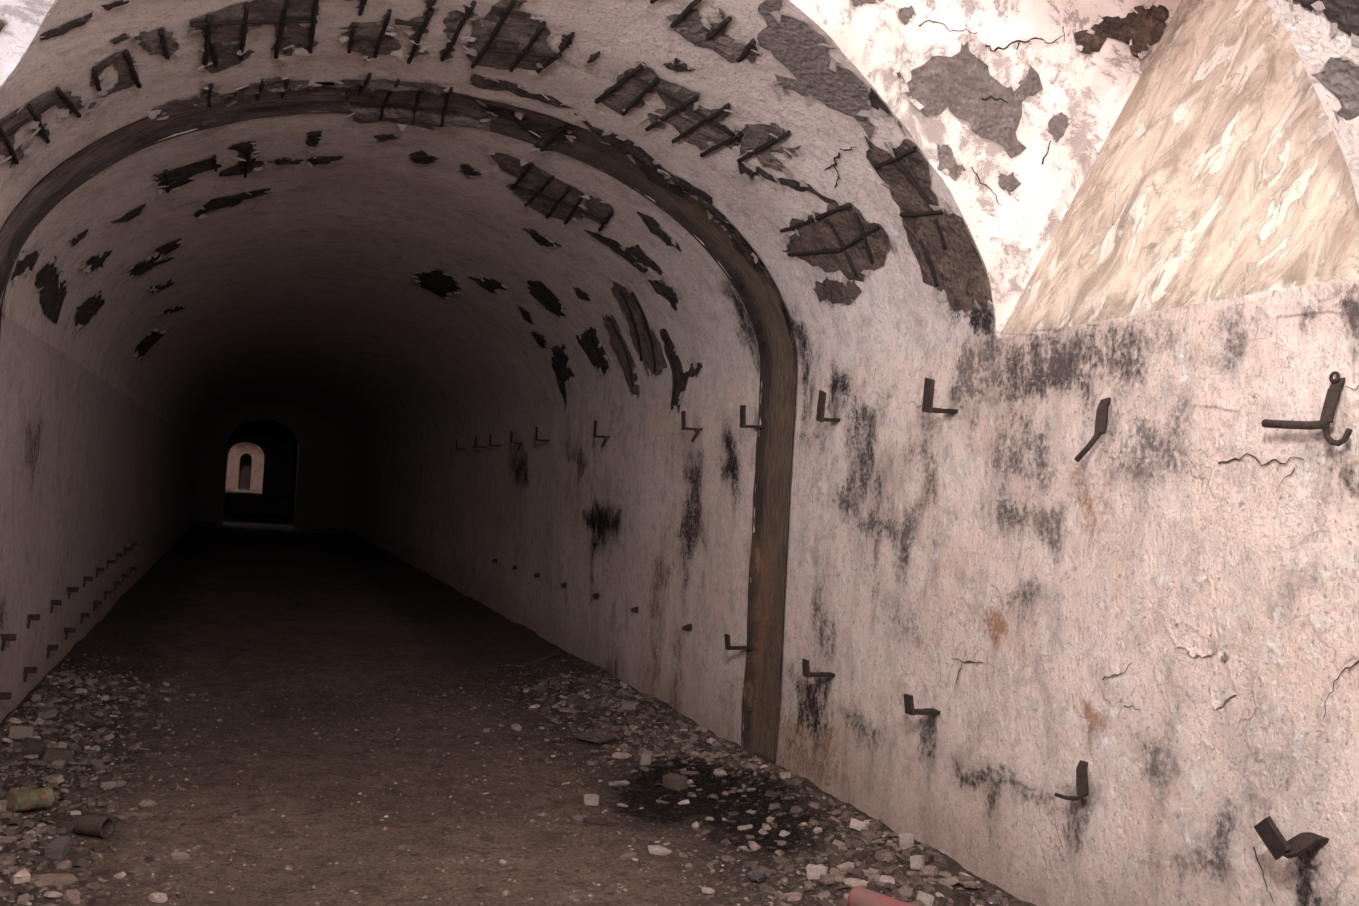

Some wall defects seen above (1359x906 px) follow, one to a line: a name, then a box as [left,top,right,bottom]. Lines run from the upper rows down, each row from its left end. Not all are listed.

flaking render [897,33,1043,195]
spalling [1073,0,1169,59]
flaking render [1287,0,1359,120]
spalling [0,0,994,414]
damp [722,270,768,371]
damp [780,304,938,581]
damp [949,293,1170,550]